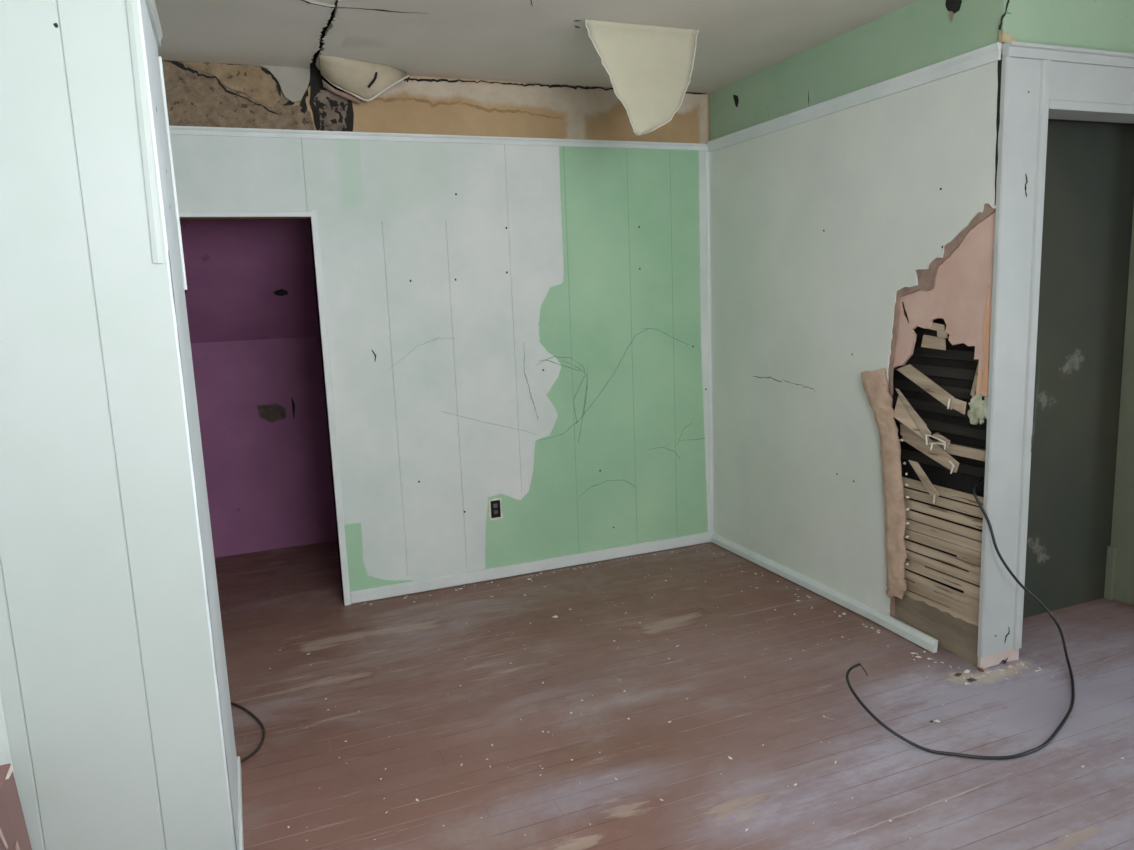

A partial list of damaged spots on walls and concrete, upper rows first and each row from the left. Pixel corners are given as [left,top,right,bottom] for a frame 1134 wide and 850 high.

flaking render [162,54,410,214]
crack [301,0,426,70]
spalling [945,0,962,22]
crack [994,0,1018,206]
peeling [481,146,784,570]
spalling [861,203,996,666]
peeling [344,519,418,591]